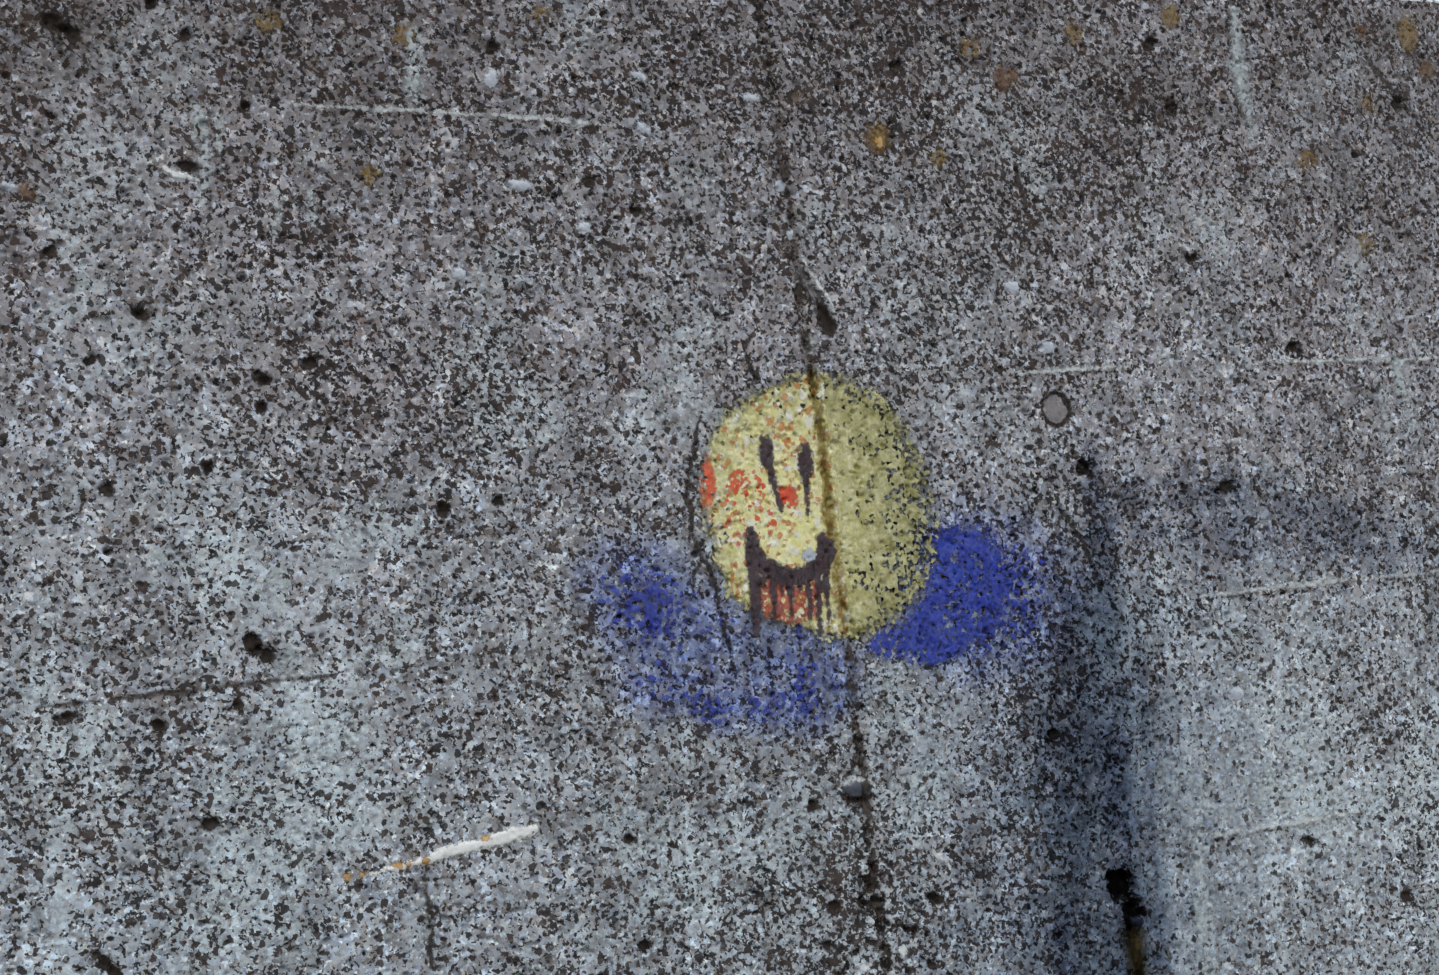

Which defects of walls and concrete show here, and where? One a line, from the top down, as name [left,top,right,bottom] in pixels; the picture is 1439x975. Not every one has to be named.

crack [756,2,813,409]
crack [844,621,903,975]
rust [1105,865,1151,975]